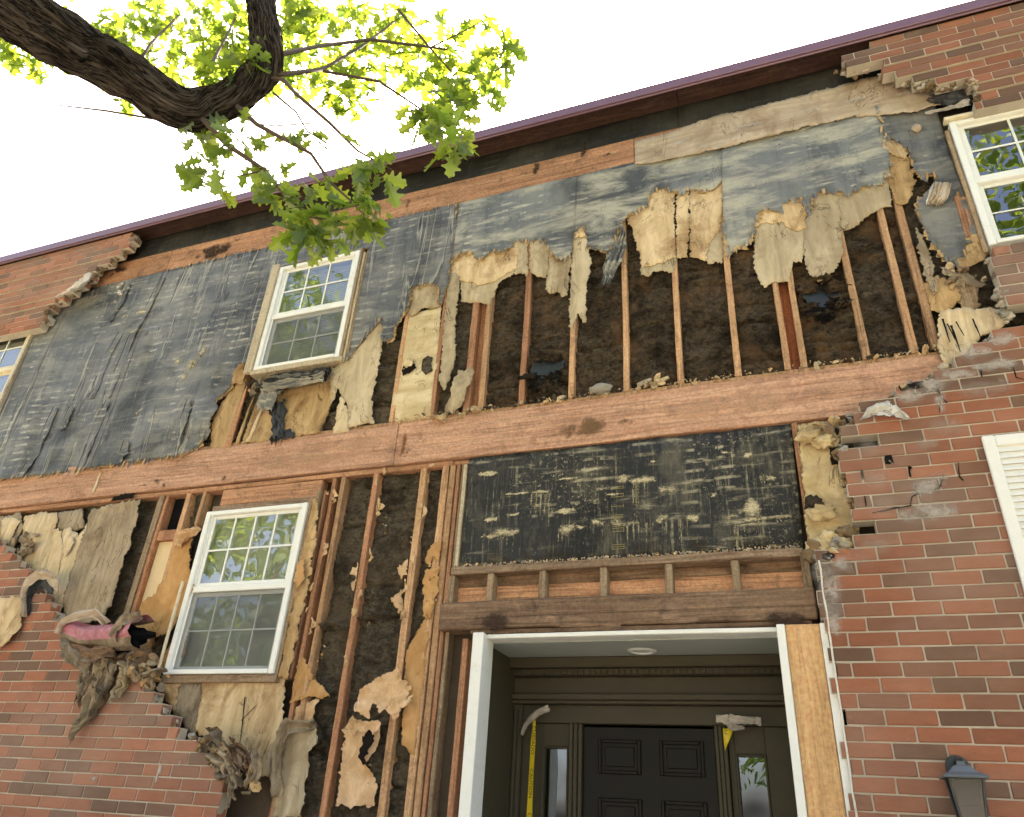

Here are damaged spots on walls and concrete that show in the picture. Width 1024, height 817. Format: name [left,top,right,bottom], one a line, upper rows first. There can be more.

peeling [627,183,724,277]
peeling [753,137,917,288]
peeling [406,223,592,390]
peeling [857,227,1016,412]
peeling [210,321,383,449]
peeling [0,499,141,623]
leakage [482,517,518,545]
leakage [506,490,698,542]
leakage [607,475,675,506]
spalling [829,422,869,519]
crack [861,463,963,513]
peeling [150,497,319,781]